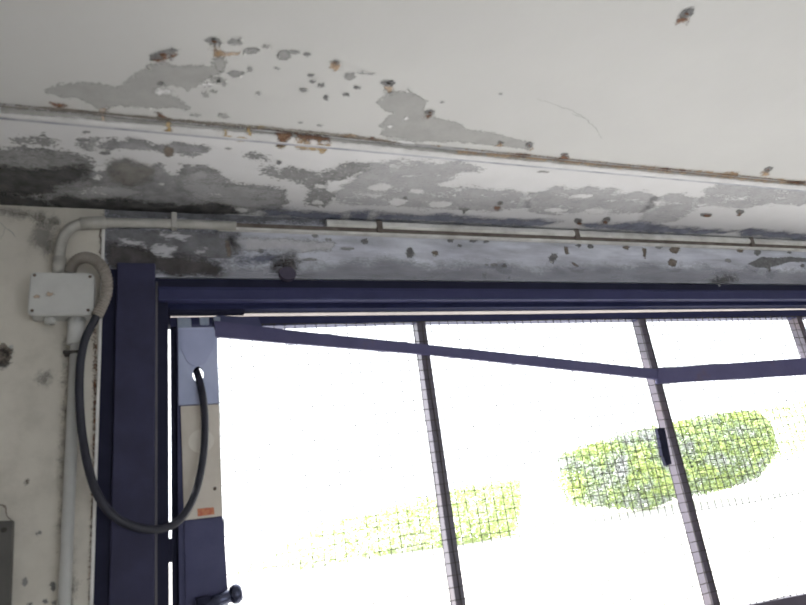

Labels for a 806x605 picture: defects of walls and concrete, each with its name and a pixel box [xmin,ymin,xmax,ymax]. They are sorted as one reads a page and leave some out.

spalling [675,8,694,25]
peeling [44,38,268,117]
spalling [275,50,311,70]
spalling [329,60,374,97]
leakage [110,160,154,186]
corrosion [0,101,806,186]
peeling [0,131,806,225]
peeling [344,80,534,151]
leakage [0,164,554,277]
leakage [582,222,806,240]